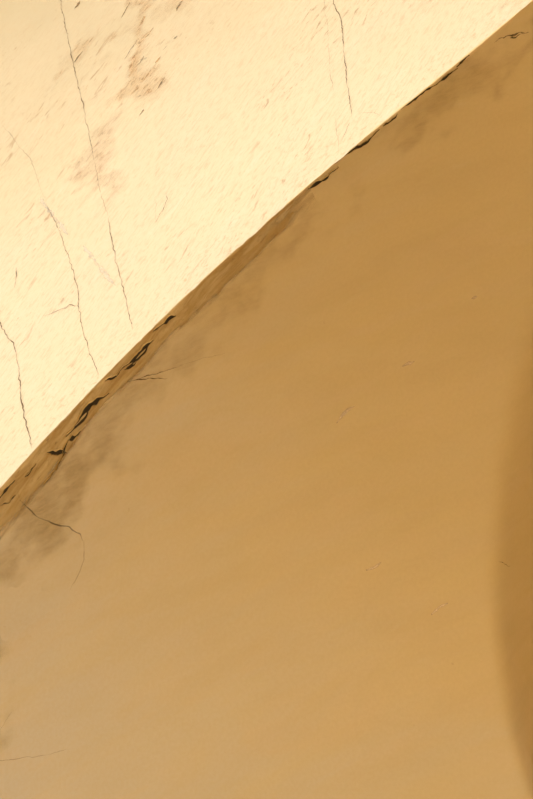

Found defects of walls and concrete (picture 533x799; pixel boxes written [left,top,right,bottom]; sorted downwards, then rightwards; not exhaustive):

crack [333,0,352,113]
crack [18,375,31,441]
spalling [0,195,301,531]